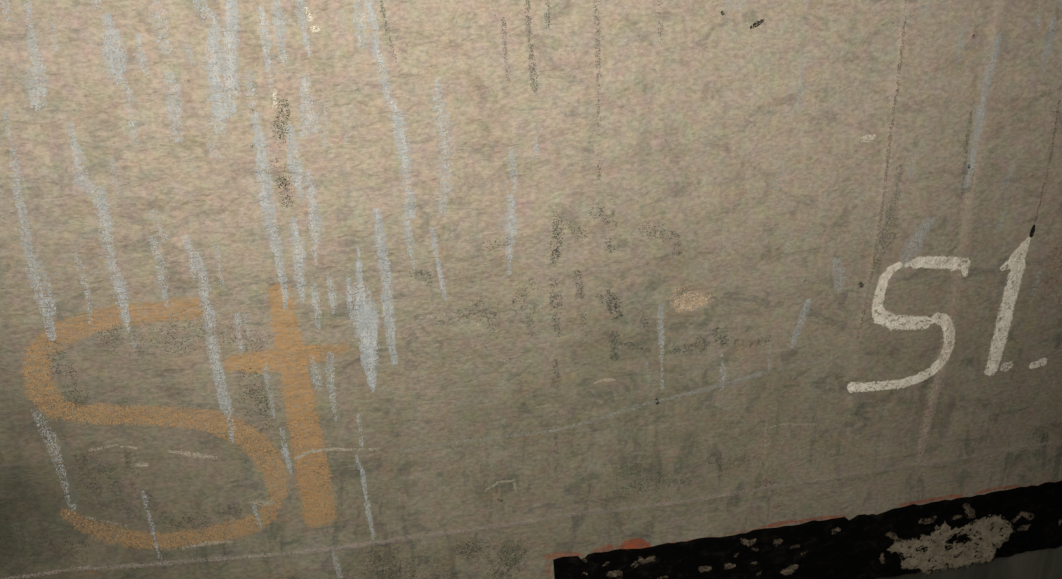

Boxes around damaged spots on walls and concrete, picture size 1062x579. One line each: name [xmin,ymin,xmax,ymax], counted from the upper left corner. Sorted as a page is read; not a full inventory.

damp [0,0,61,112]
damp [0,110,90,409]
damp [67,121,293,473]
damp [91,0,398,393]
damp [339,0,562,339]
damp [550,203,618,265]
crack [857,1,907,338]
damp [31,408,263,558]
peeling [604,556,655,579]
peeling [724,538,762,575]
peeling [773,539,807,575]
peeling [879,503,1035,574]